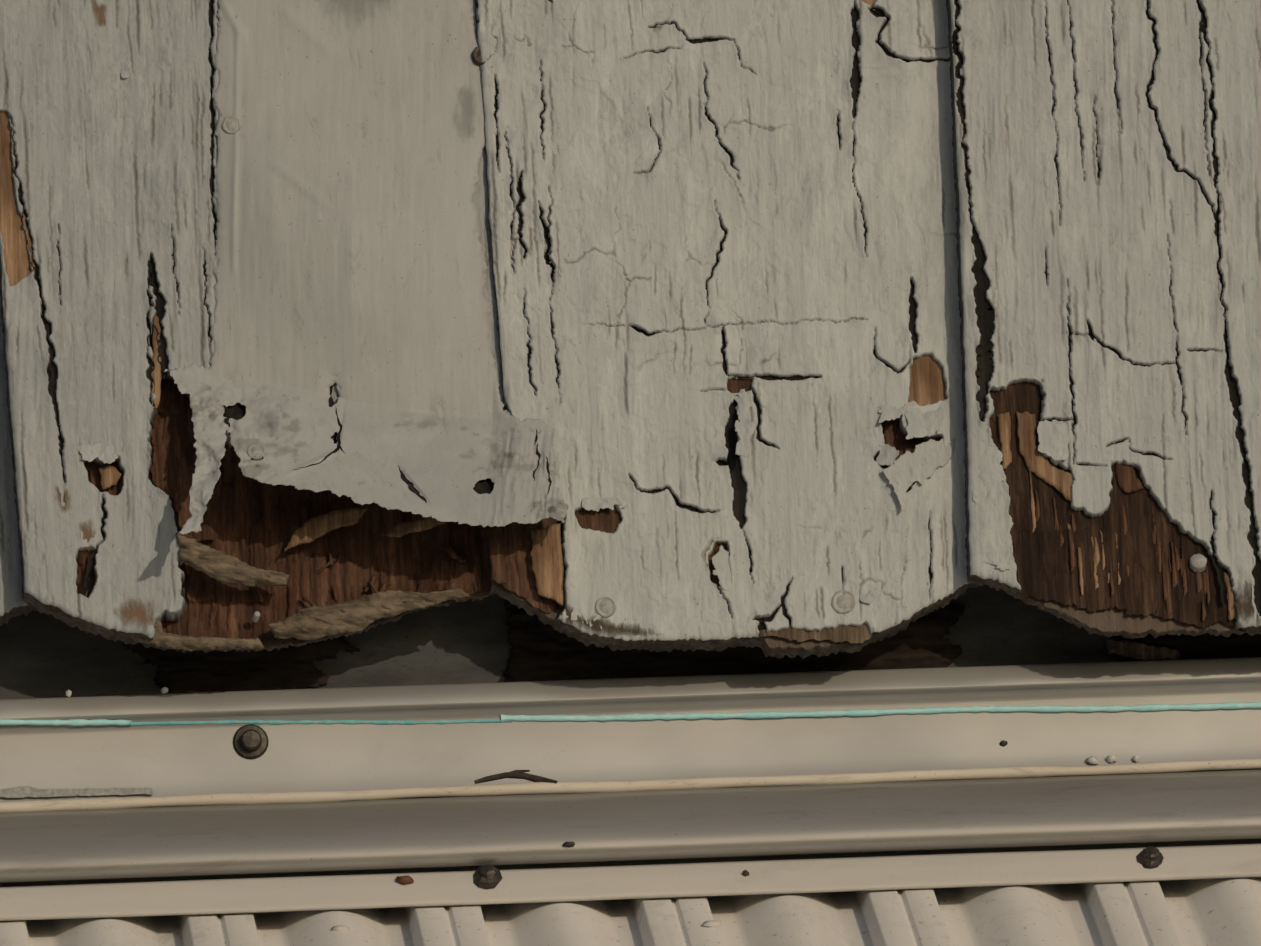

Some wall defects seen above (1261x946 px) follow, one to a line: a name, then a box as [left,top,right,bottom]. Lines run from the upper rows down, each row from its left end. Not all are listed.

peeling [0,112,35,287]
crack [10,130,65,481]
peeling [79,443,118,464]
crack [146,0,217,410]
crack [493,74,560,412]
peeling [575,495,626,533]
crack [630,217,820,579]
peeling [876,355,955,511]
crack [837,0,995,422]
peeling [972,445,1013,571]
peeling [1037,420,1072,461]
crack [1037,0,1261,616]